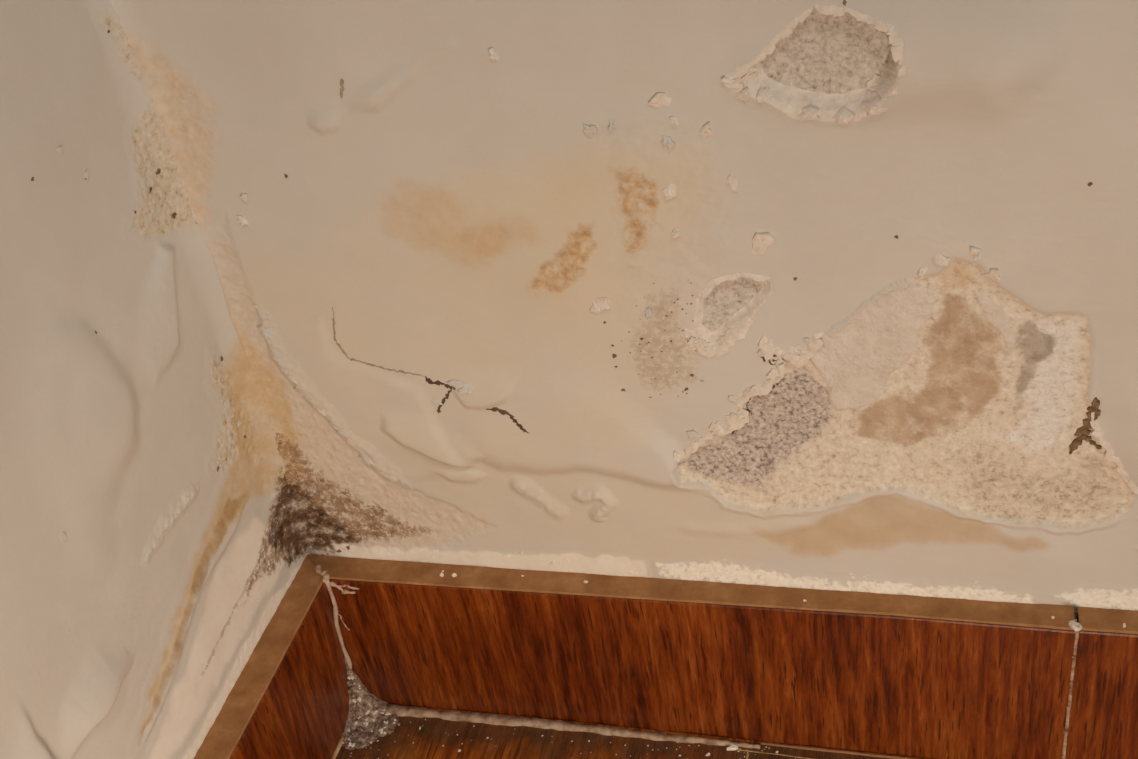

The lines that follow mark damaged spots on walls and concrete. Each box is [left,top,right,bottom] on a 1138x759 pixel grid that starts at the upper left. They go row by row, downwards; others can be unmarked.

leakage [120,19,236,239]
spalling [721,4,913,124]
leakage [352,84,758,415]
crack [332,307,458,413]
crack [486,407,528,433]
flaking render [669,253,1138,537]
crack [1069,397,1102,454]
leakage [142,418,1138,759]